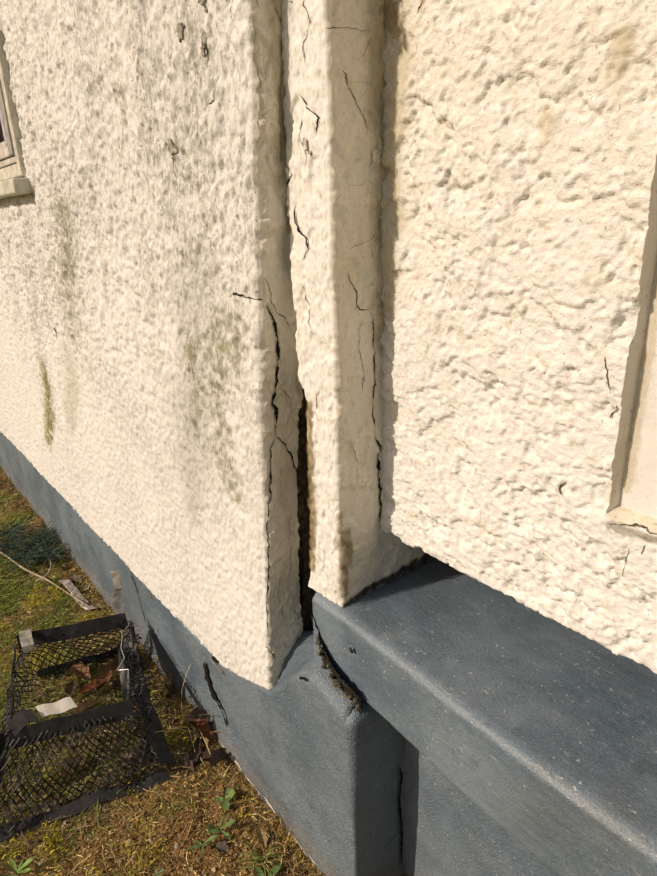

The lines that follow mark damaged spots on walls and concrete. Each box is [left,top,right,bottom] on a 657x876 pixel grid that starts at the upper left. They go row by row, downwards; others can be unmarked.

crack [252,0,380,185]
water stain [49,197,79,349]
crack [294,206,309,258]
water stain [35,350,55,454]
water stain [186,306,242,504]
crack [348,274,382,528]
crack [229,279,361,714]
crack [609,523,657,576]
crack [203,656,227,726]
crack [388,768,403,862]